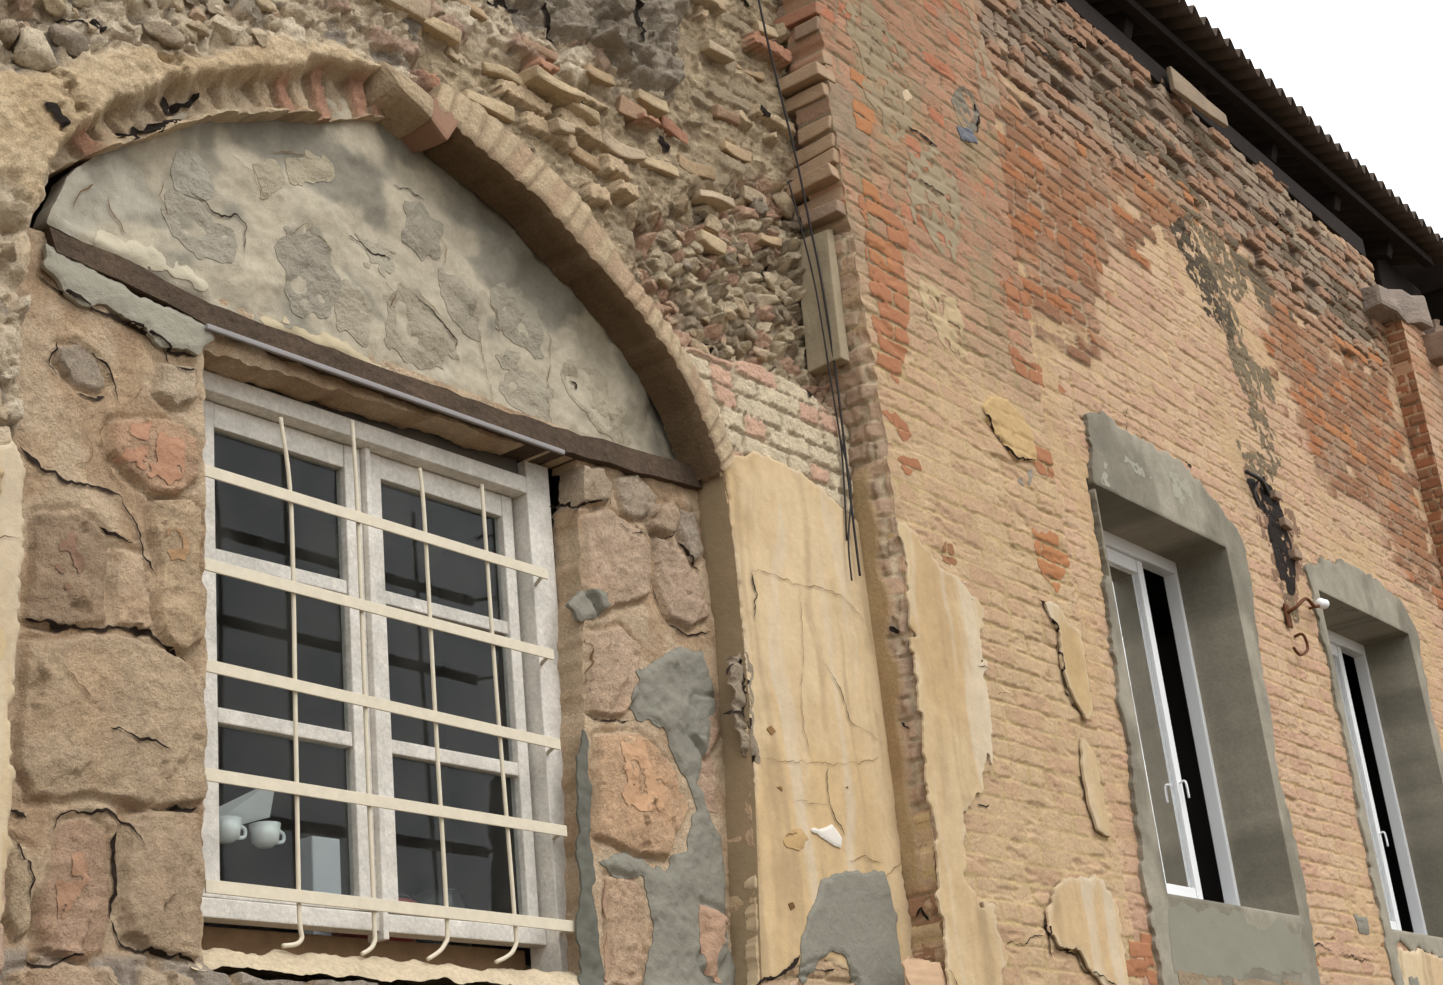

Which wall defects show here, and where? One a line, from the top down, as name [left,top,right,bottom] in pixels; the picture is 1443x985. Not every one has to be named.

spalling [364,0,767,213]
spalling [161,148,238,263]
spalling [252,150,335,200]
spalling [695,229,727,257]
flaking render [858,178,910,384]
spalling [274,201,631,447]
flaking render [882,410,922,475]
peeling [982,395,1054,479]
spalling [725,651,776,764]
peeling [783,824,842,851]
spalling [698,905,729,983]
flaking render [1125,933,1158,985]